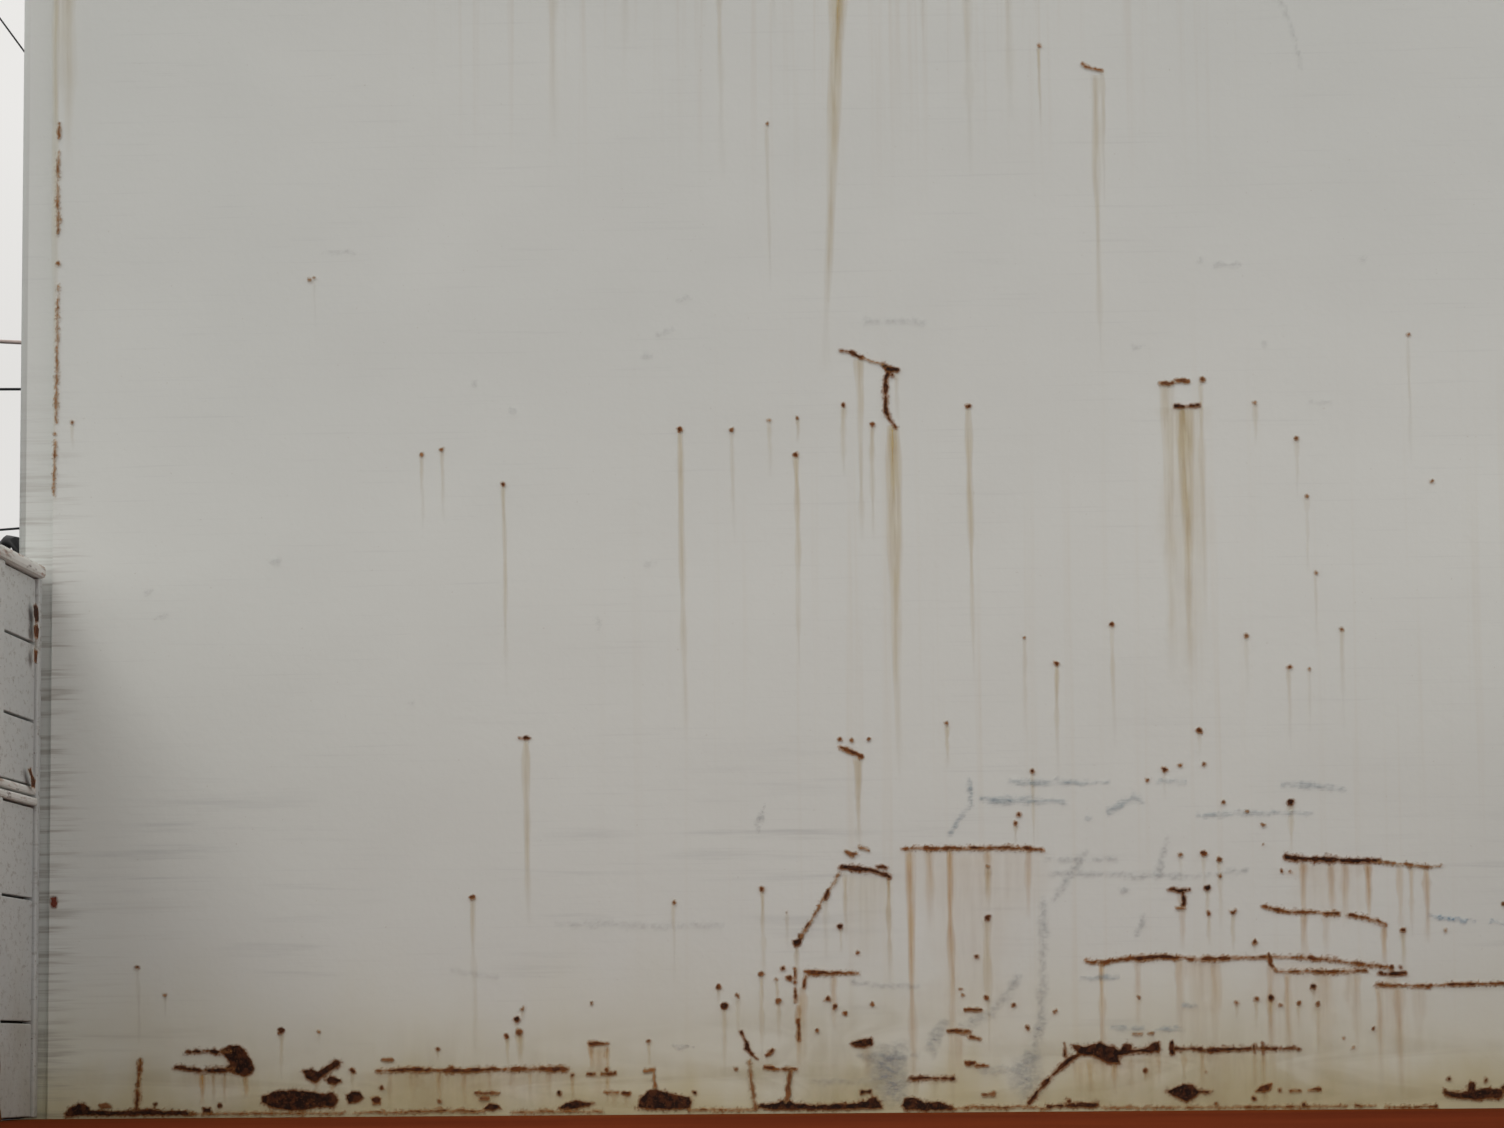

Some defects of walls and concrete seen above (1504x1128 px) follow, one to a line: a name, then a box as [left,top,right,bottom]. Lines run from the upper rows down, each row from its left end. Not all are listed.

corrosion [1178,850,1222,891]
corrosion [1234,984,1320,1007]
corrosion [850,1037,873,1048]
corrosion [174,1045,254,1084]
corrosion [64,1058,602,1118]
corrosion [637,1068,883,1113]
corrosion [901,1096,1046,1112]
corrosion [1104,1071,1504,1110]